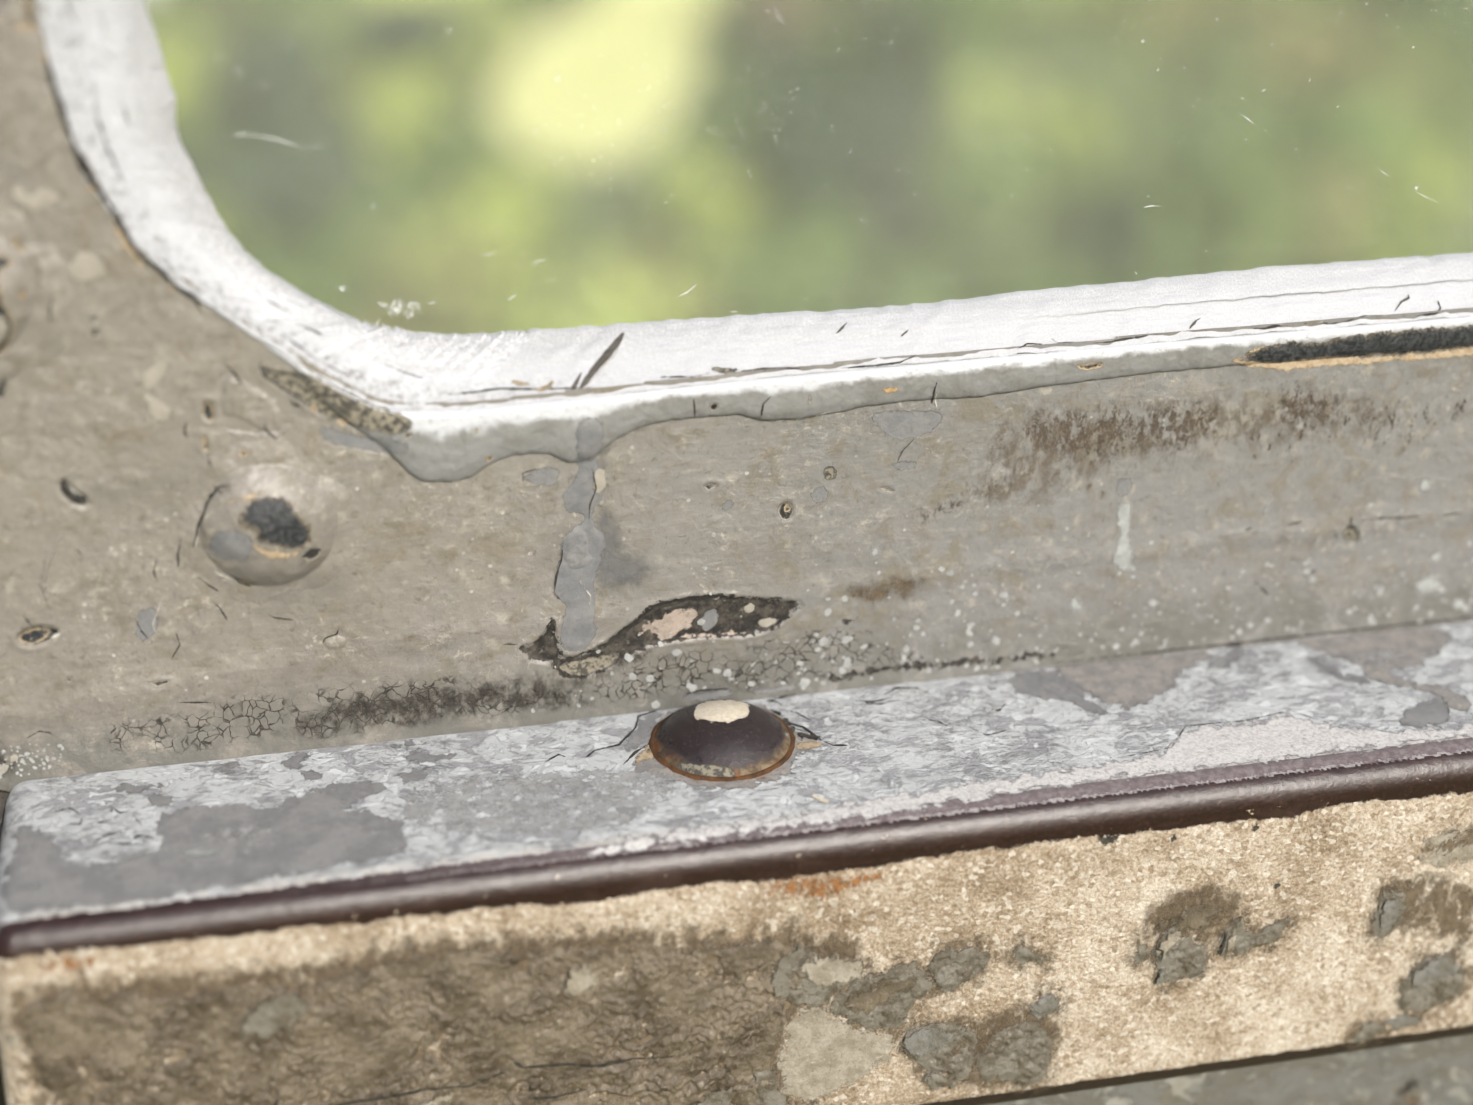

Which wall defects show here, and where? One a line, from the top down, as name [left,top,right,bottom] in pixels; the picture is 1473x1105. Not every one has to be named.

peeling [0,236,40,354]
peeling [0,377,8,400]
peeling [1231,324,1473,372]
peeling [209,490,321,562]
peeling [519,593,800,681]
rust [631,704,822,790]
peeling [0,626,1473,928]
peeling [1128,886,1298,994]
peeling [1365,885,1410,947]
peeling [6,919,1065,1105]
peeling [1345,947,1473,1049]